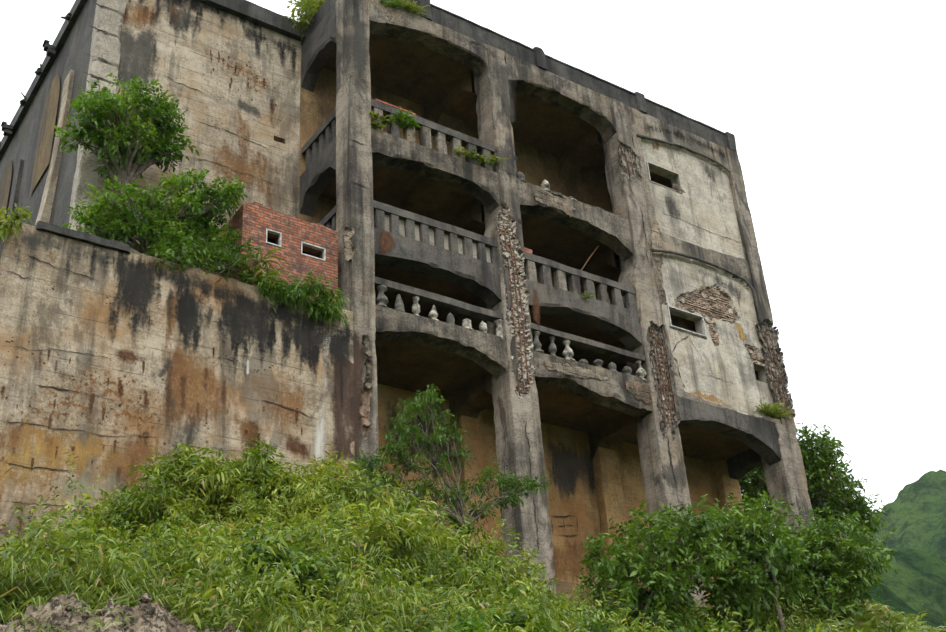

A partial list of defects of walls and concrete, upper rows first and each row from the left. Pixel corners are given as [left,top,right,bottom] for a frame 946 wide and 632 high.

leakage [117,30,156,90]
corrosion [123,4,156,29]
leakage [156,0,296,71]
corrosion [206,50,277,122]
leakage [16,233,354,374]
spalling [496,202,609,399]
corrosion [0,295,265,498]
corrosion [262,387,311,457]
leakage [315,419,326,457]
peeling [332,331,373,462]
spalling [626,321,680,440]
spalling [745,319,796,419]